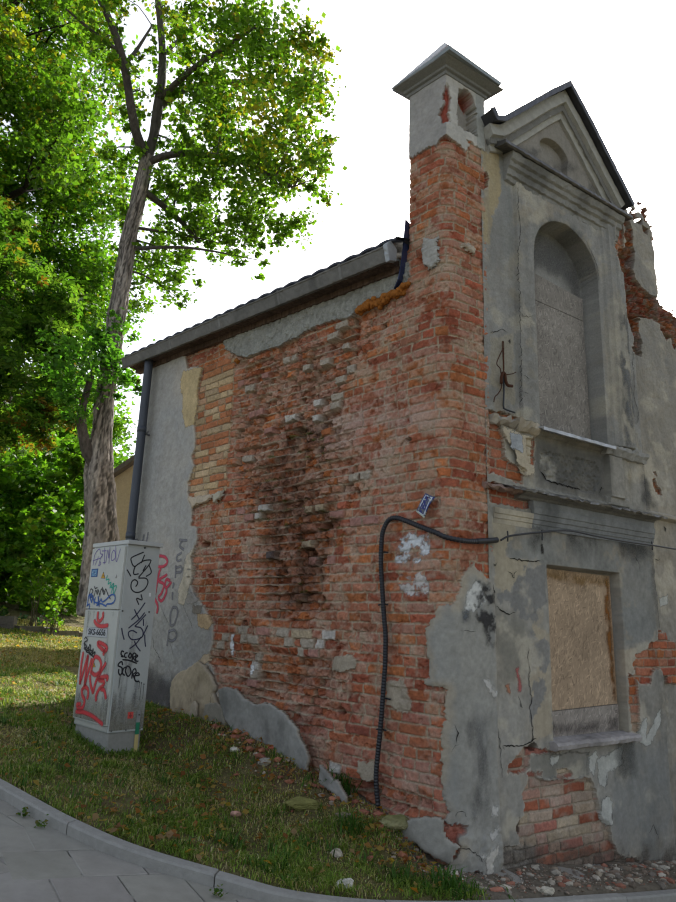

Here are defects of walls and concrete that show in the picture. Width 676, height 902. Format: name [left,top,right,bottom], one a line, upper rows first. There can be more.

flaking render [439,86,472,123]
crack [491,199,530,402]
spalling [614,220,676,357]
spalling [178,134,529,866]
crack [498,652,536,771]
flaking render [628,630,676,746]
flaking render [502,741,642,869]